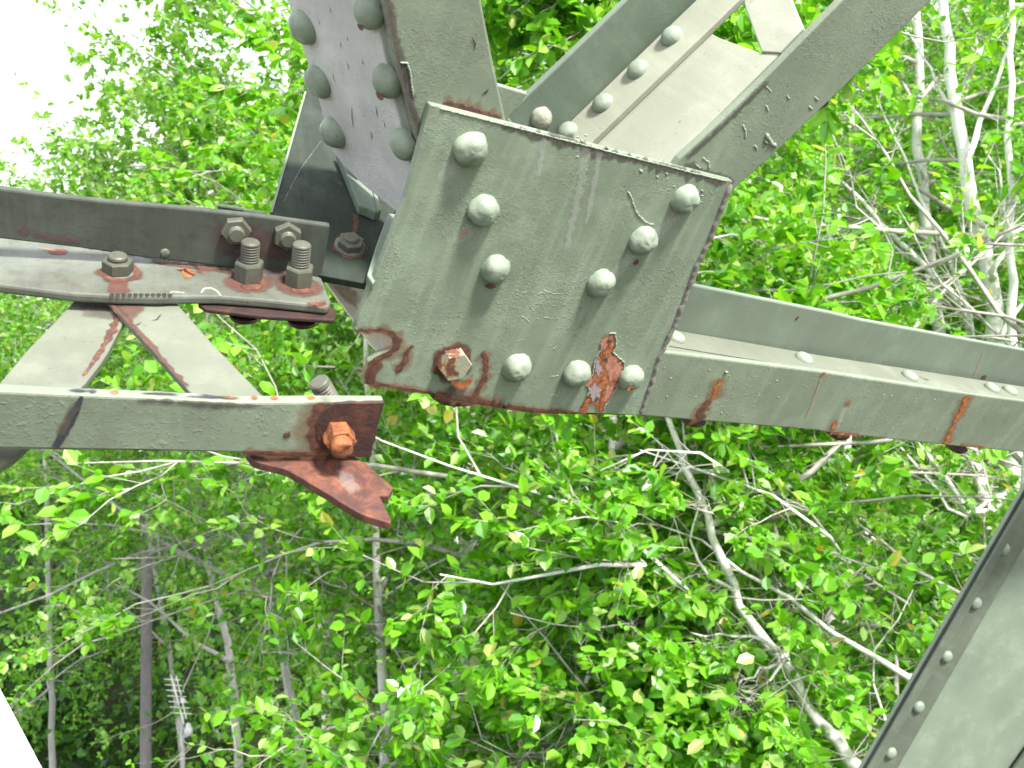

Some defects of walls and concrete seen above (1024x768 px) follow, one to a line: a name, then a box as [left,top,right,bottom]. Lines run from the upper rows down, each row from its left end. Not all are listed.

rust [151,258,326,306]
rust [83,265,188,385]
rust [243,395,332,456]
rust [358,328,574,413]
peeling [579,332,634,414]
rust [696,371,728,421]
rust [944,396,983,447]